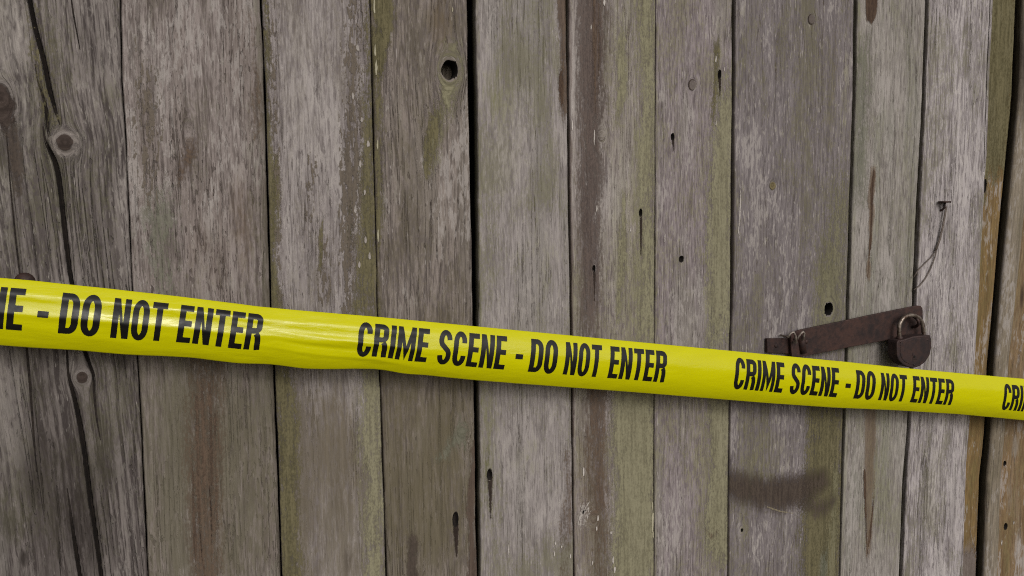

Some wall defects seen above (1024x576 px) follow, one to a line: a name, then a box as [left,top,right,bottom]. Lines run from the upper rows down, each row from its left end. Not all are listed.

crack [71,0,80,49]
corrosion [866,0,877,24]
crack [6,133,21,274]
crack [28,0,74,285]
crack [25,347,37,472]
crack [66,350,103,576]